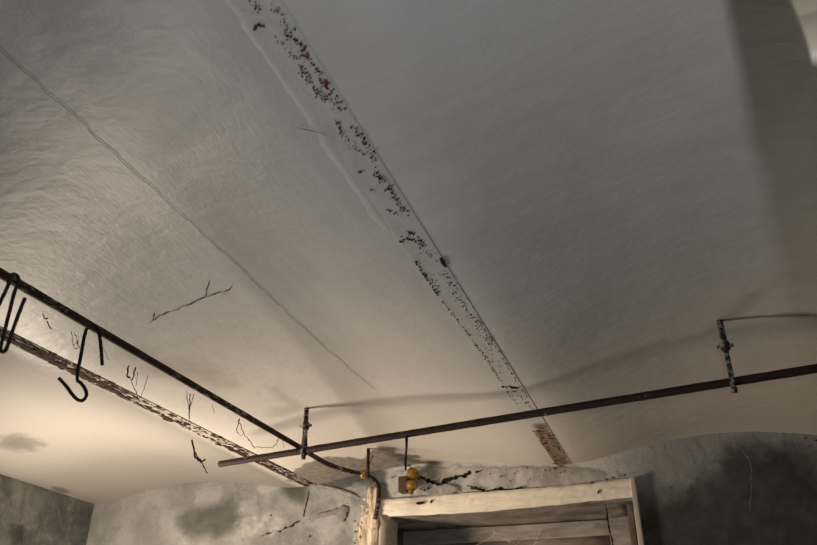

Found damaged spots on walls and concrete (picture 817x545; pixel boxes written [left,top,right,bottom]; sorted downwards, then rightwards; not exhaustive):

rust [248,0,347,111]
crack [1,51,369,385]
rust [336,121,409,217]
rust [399,231,533,409]
rust [0,330,311,486]
crack [417,470,526,492]
rust [532,424,568,465]
water stain [641,447,817,545]